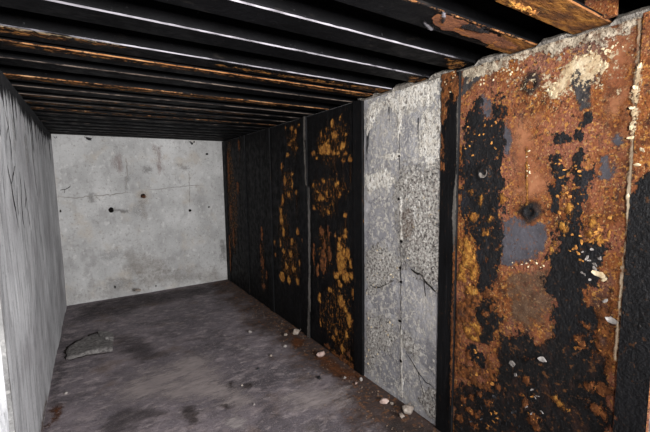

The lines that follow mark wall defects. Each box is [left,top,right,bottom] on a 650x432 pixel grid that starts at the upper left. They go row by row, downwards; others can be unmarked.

water stain [462,17,642,111]
corrosion [274,124,300,285]
corrosion [311,114,361,381]
crack [397,196,405,245]
crack [372,262,438,306]
corrosion [514,115,549,205]
corrosion [555,191,574,233]
corrosion [584,216,611,247]
corrosion [621,120,635,220]
crack [400,325,434,400]
corrosion [449,235,507,429]
corrosion [570,265,624,423]